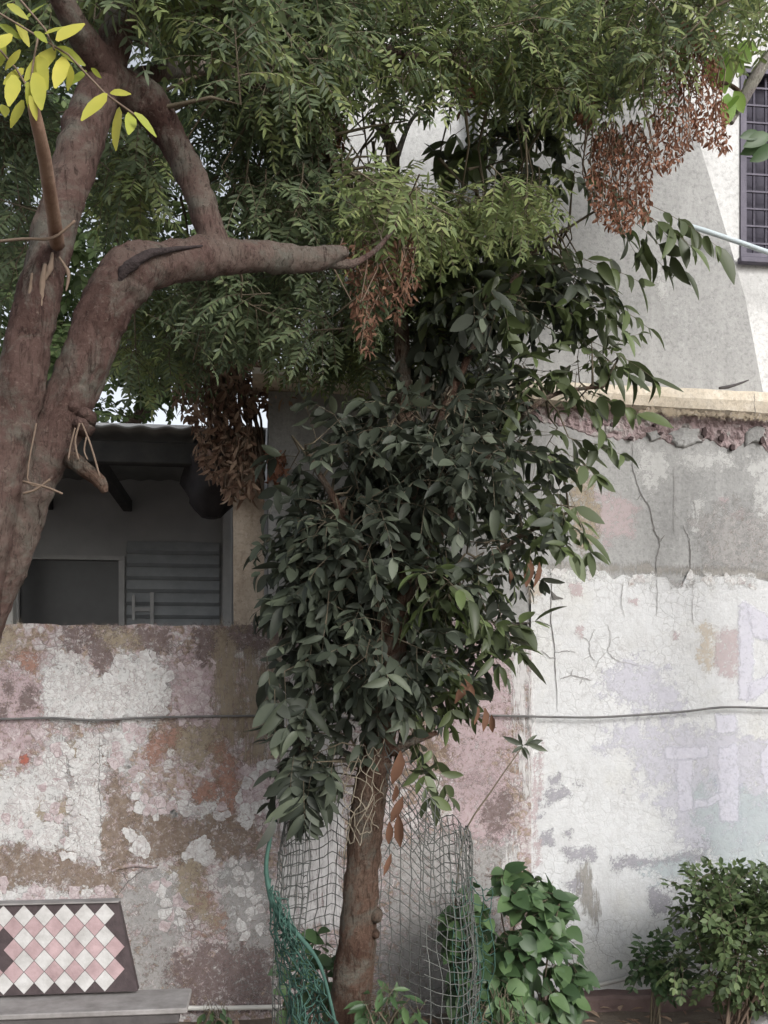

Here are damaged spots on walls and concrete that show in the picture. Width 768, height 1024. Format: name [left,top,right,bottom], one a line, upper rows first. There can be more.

spalling [526,405,768,453]
crack [632,442,698,626]
peeling [0,625,350,941]